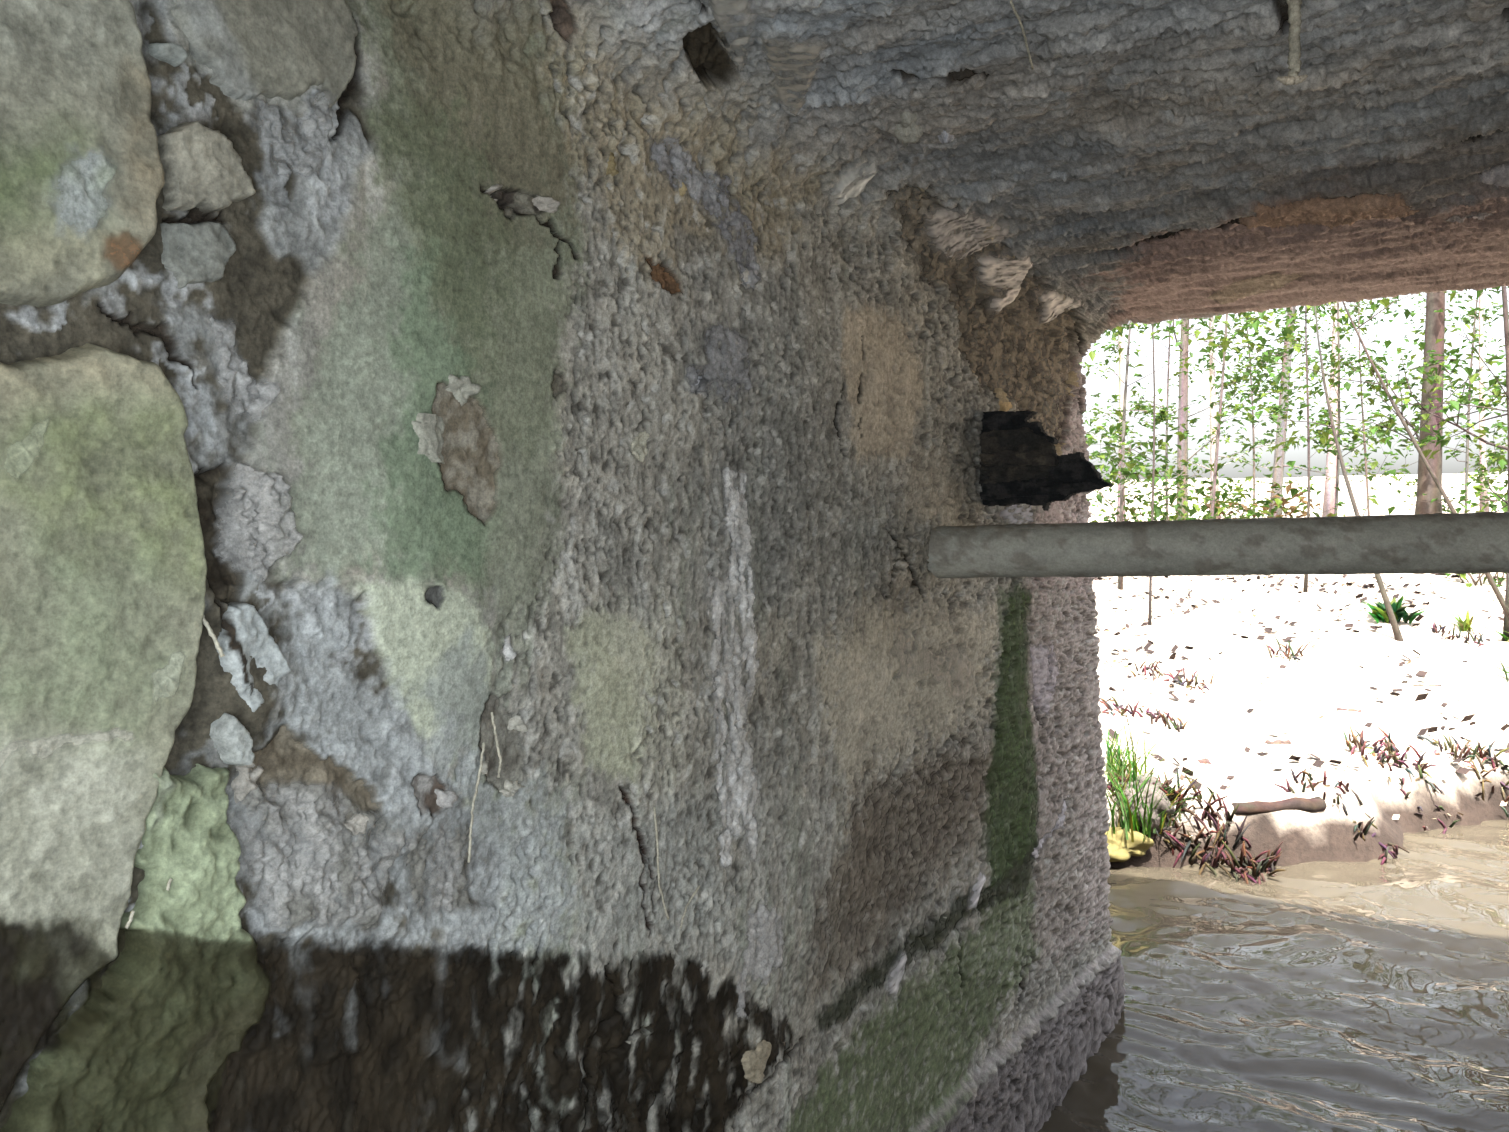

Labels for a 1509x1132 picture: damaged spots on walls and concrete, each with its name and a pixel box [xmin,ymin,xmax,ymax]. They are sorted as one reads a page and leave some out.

spalling [682,22,736,83]
crack [536,219,577,279]
spalling [412,374,501,524]
water stain [1030,644,1059,713]
crack [619,788,653,930]
water stain [0,905,793,1132]